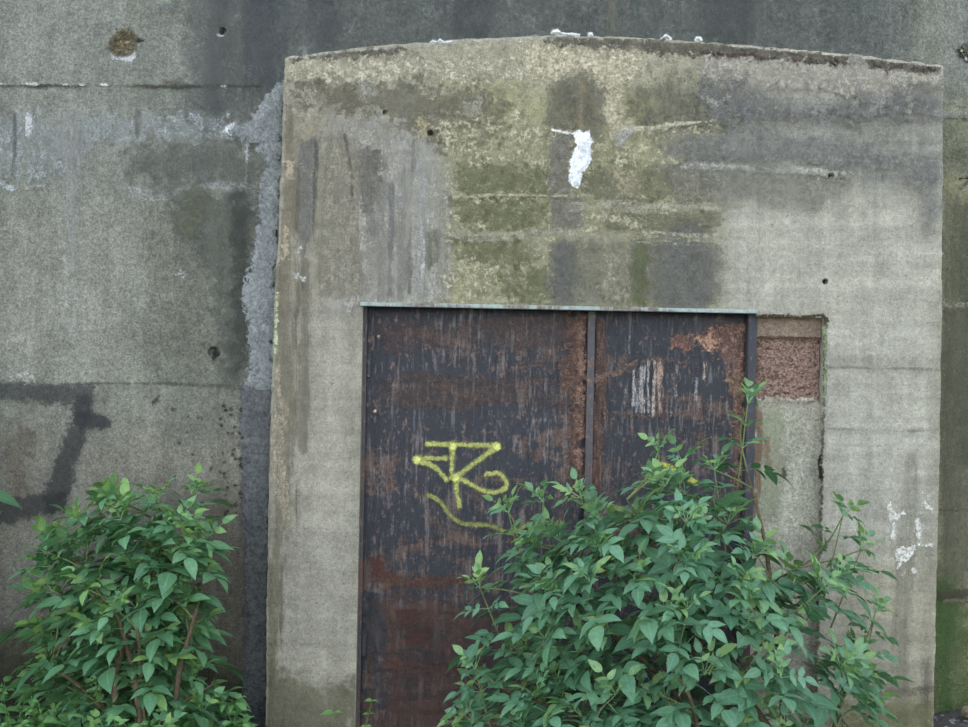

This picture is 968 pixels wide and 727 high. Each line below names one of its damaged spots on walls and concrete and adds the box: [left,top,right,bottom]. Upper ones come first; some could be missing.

spalling [108,27,145,63]
damp [0,0,968,563]
rust [557,310,786,518]
spalling [756,396,819,410]
crack [757,313,829,568]
damp [267,558,286,677]
rust [362,589,568,727]
crack [814,592,822,693]
damp [879,583,955,712]